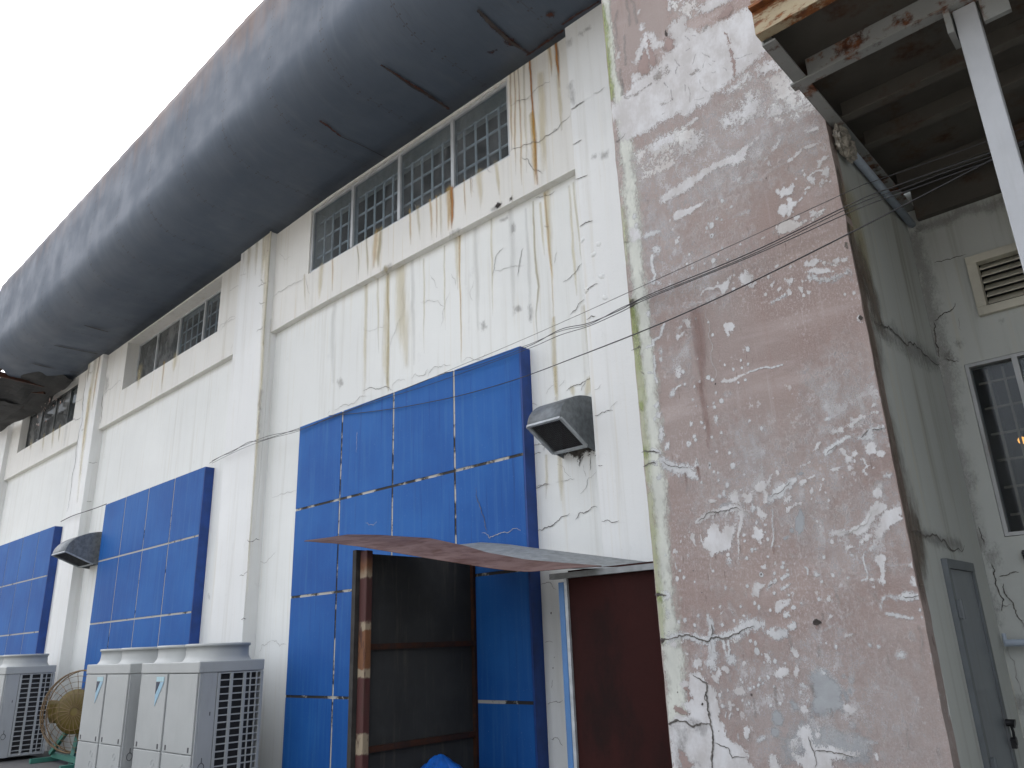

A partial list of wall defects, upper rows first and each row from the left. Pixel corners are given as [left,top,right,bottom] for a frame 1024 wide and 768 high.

corrosion [477,1,599,170]
crack [513,101,583,197]
crack [875,306,960,365]
water stain [629,298,648,479]
peeling [602,0,926,768]
crack [476,444,618,537]
crack [910,527,984,552]
crack [660,624,753,655]
crack [992,566,1024,627]
crack [668,675,745,768]